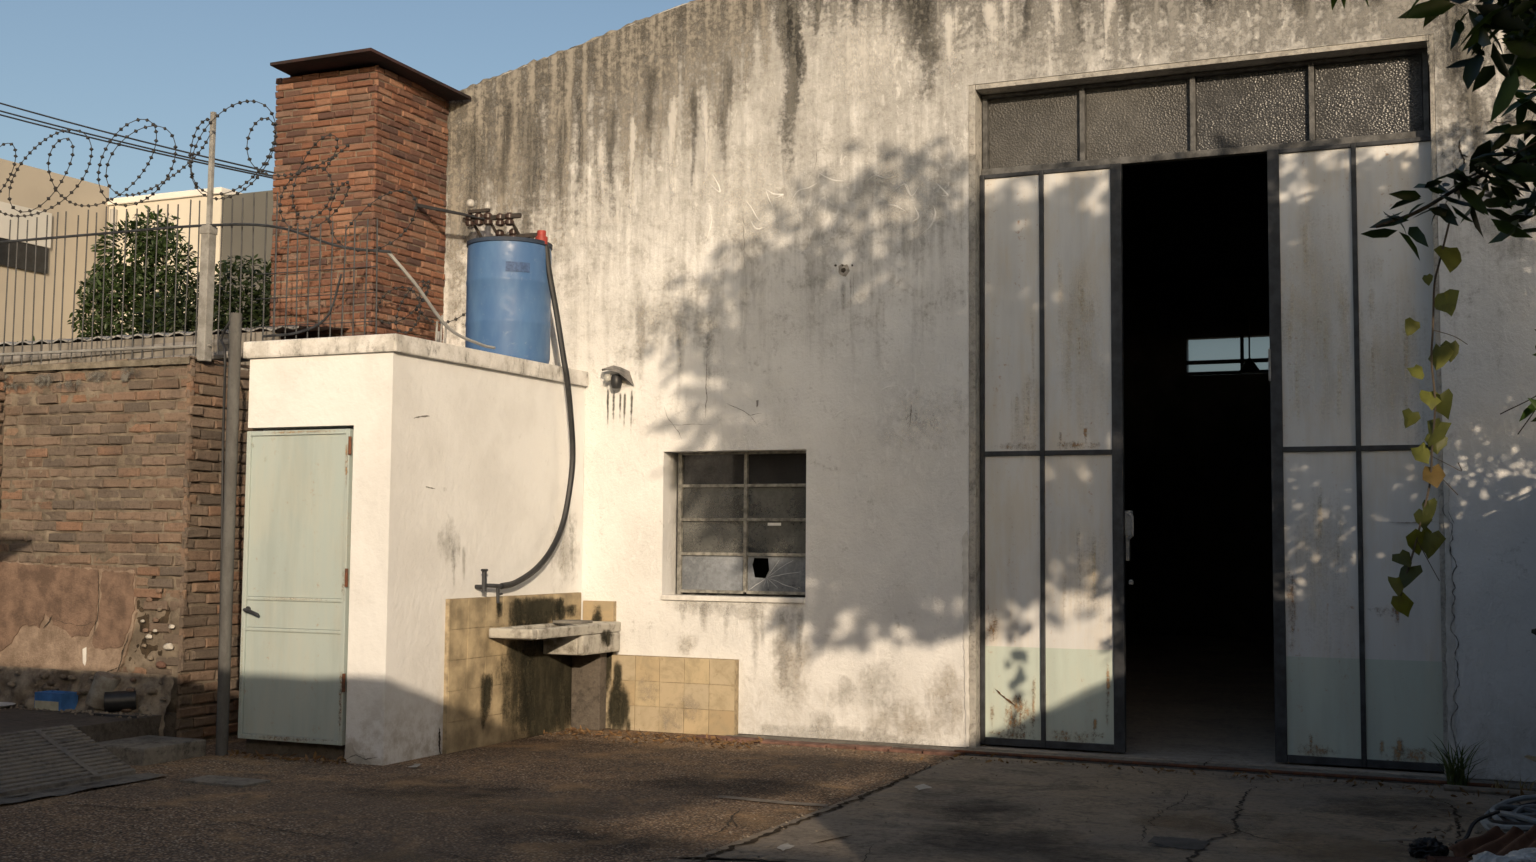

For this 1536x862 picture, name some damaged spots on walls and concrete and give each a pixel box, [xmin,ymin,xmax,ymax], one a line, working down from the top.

water stain [446,0,1534,328]
peeling [0,561,175,736]
water stain [481,597,602,738]
water stain [606,652,630,730]
rust [991,689,1035,738]
crack [1137,759,1280,862]
crack [1438,800,1462,839]